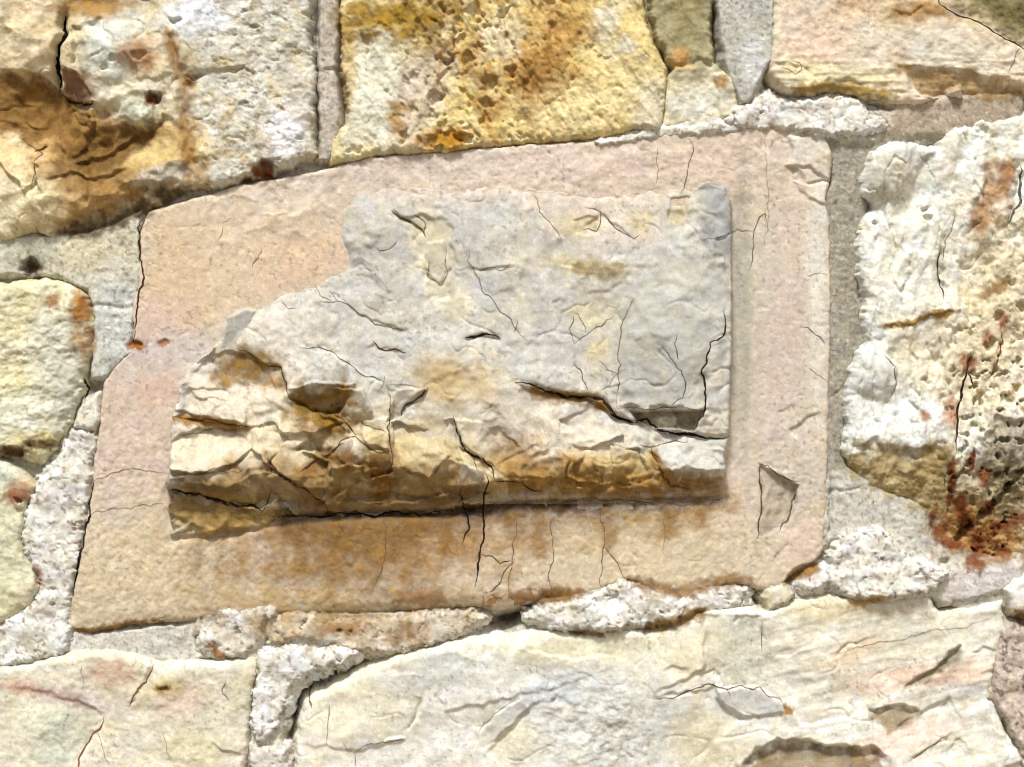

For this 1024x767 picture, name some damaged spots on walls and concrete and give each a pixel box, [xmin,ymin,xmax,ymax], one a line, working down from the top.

crack [55,16,93,106]
rust [0,74,161,192]
leakage [64,187,184,238]
rust [242,159,273,183]
crack [133,217,145,342]
crack [375,210,527,340]
crack [73,286,729,596]
crack [757,464,799,538]
rust [962,357,976,371]
crack [943,331,1003,487]
rust [925,458,1024,572]
rust [968,448,990,486]